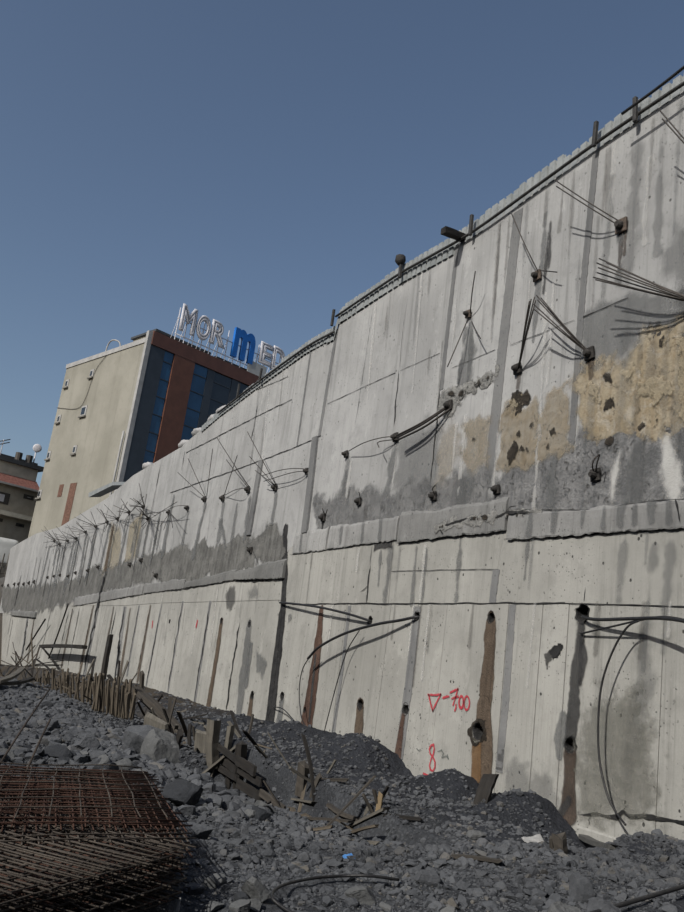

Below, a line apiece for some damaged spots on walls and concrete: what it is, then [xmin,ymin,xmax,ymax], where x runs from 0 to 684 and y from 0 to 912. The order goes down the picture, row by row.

water stain [582,290,684,373]
spalling [438,364,500,418]
spalling [463,315,684,474]
water stain [313,426,684,534]
water stain [2,495,286,631]
rust [206,618,223,707]
rust [301,605,323,726]
rust [354,699,364,734]
rust [395,714,405,759]
rust [471,612,496,783]
spalling [544,643,563,666]
water stain [554,622,587,825]